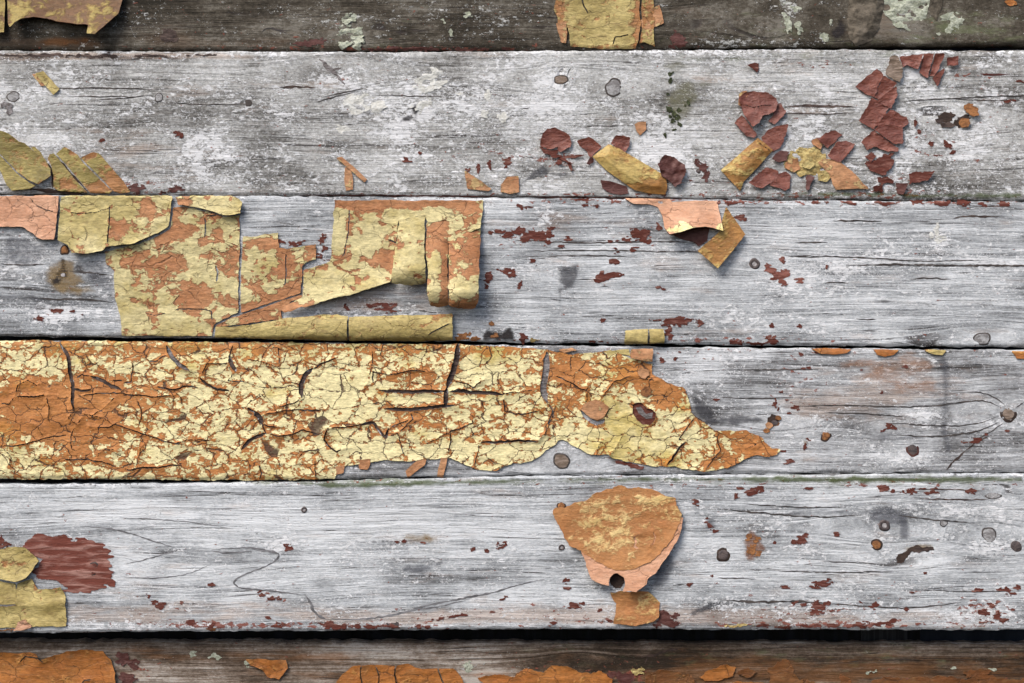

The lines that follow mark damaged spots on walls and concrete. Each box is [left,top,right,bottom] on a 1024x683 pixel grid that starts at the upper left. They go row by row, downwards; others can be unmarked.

peeling [554,0,688,49]
peeling [539,53,1010,283]
crack [1,264,113,303]
peeling [0,131,795,481]
crack [5,346,279,471]
peeling [0,536,67,632]
peeling [553,485,683,629]
peeling [0,650,140,683]
peeling [336,661,616,683]
peeling [631,659,815,683]